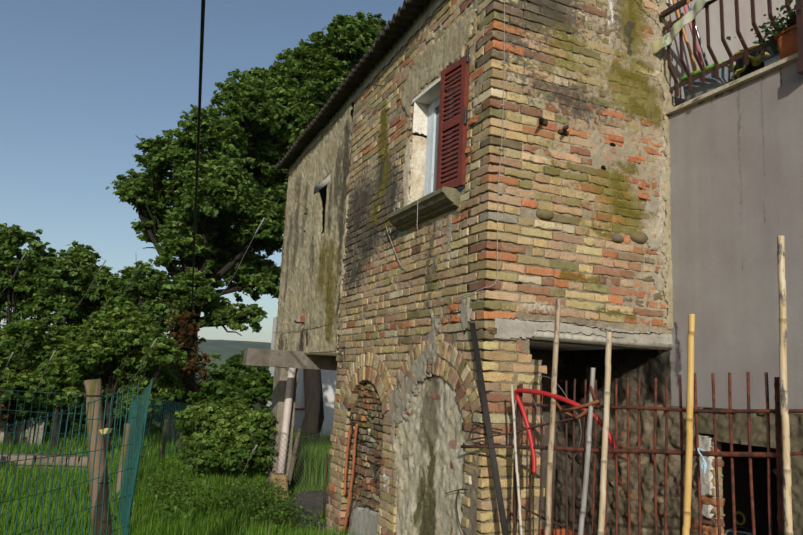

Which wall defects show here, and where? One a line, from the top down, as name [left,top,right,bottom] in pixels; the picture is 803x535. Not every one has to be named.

peeling [402,8,477,207]
leakage [624,0,642,55]
leakage [284,120,379,342]